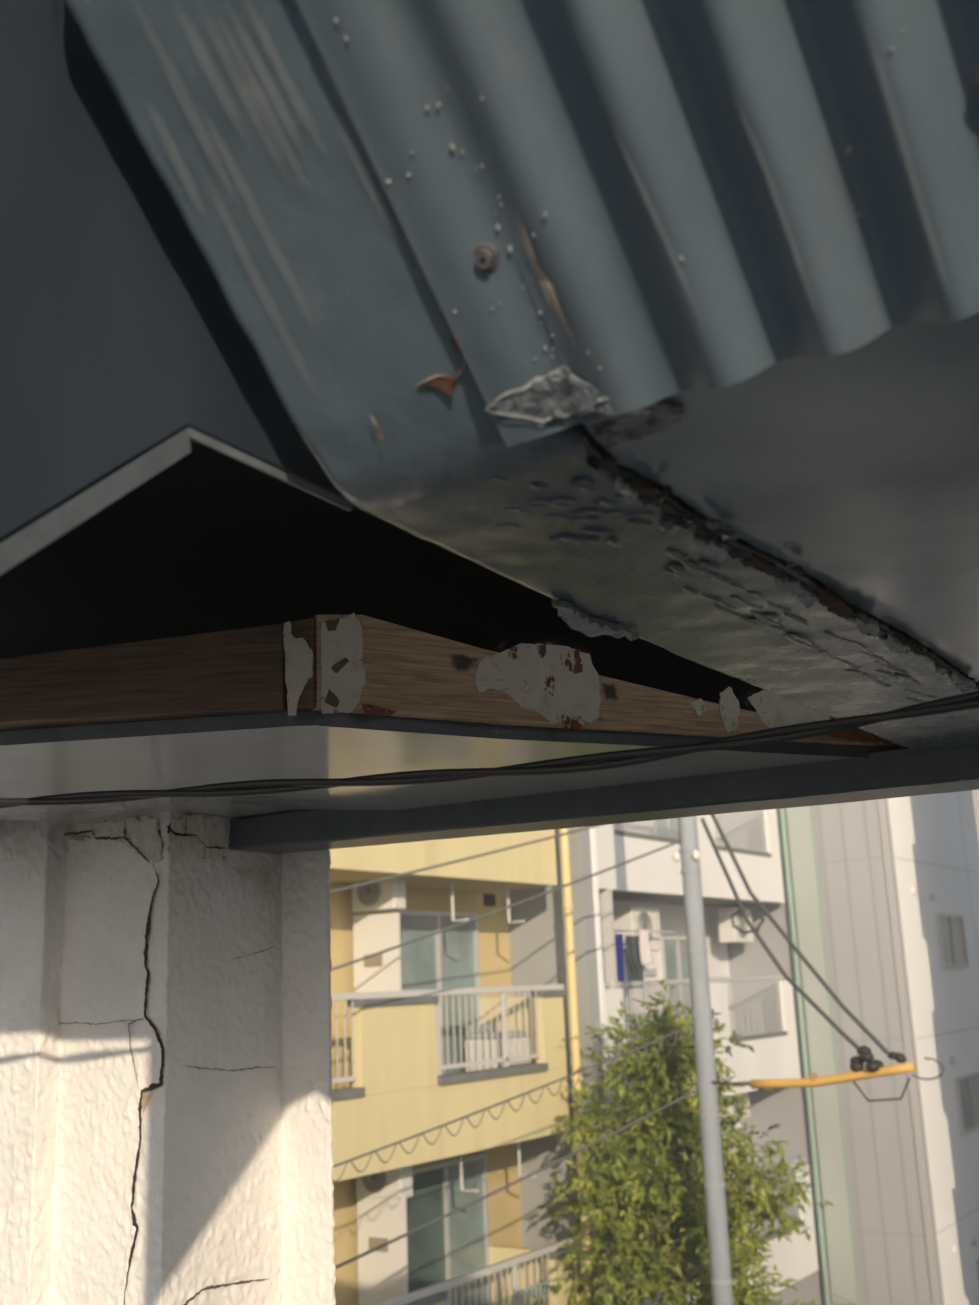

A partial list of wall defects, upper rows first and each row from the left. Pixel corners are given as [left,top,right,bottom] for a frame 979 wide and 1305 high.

peeling [485,229,685,449]
peeling [283,613,396,717]
peeling [475,643,601,732]
peeling [552,599,639,641]
peeling [690,686,831,733]
crack [59,863,273,1305]